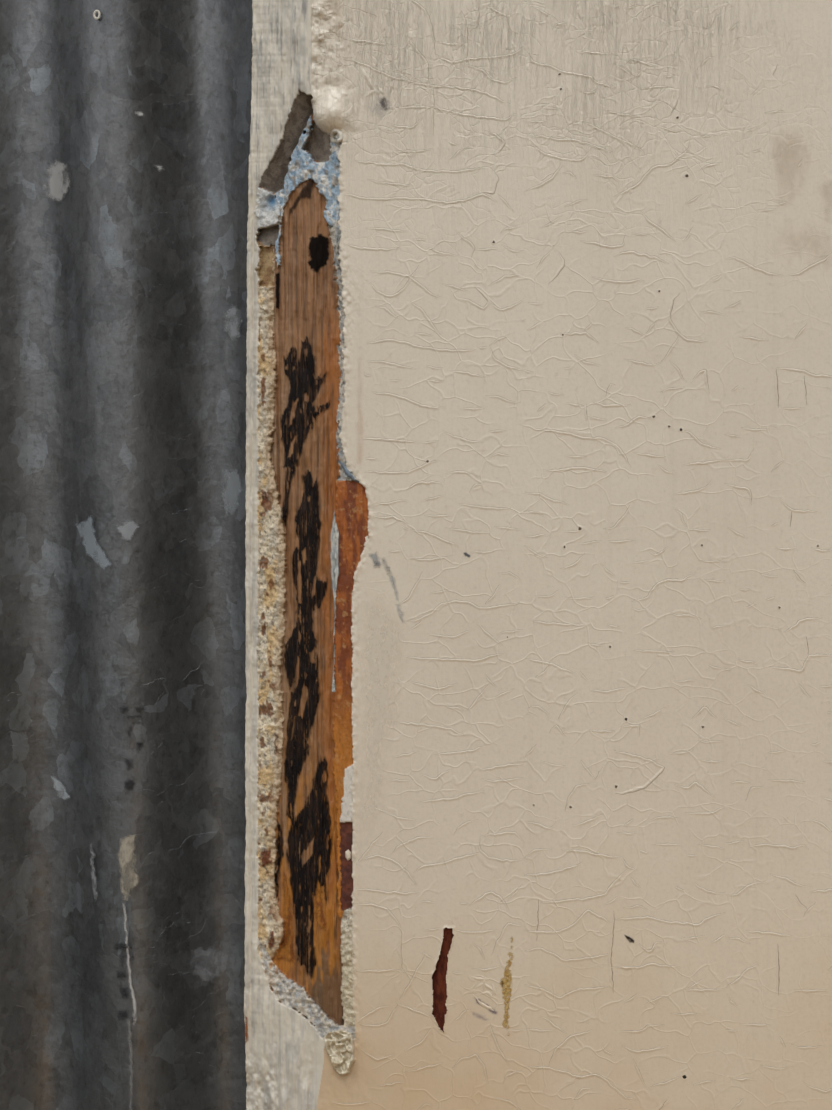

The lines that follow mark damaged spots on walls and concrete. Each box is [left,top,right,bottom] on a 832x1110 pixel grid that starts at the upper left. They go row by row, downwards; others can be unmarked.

crack [341,0,832,698]
peeling [254,90,369,1076]
crack [392,721,538,803]
crack [588,730,715,798]
peeling [432,927,454,1032]
crack [355,821,725,1110]
crack [746,819,832,996]